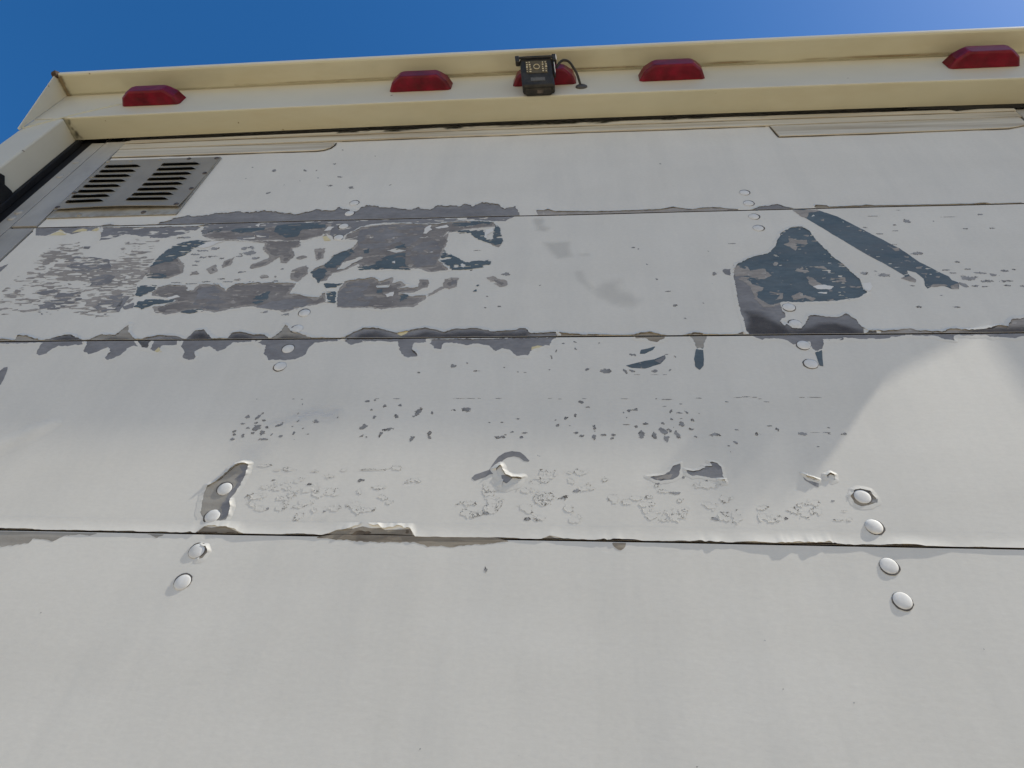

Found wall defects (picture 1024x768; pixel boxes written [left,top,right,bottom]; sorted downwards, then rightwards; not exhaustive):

peeling [0,201,1024,375]
peeling [230,403,318,441]
peeling [359,398,401,438]
peeling [555,398,700,442]
peeling [457,451,608,523]
peeling [644,459,744,525]
peeling [328,538,497,547]